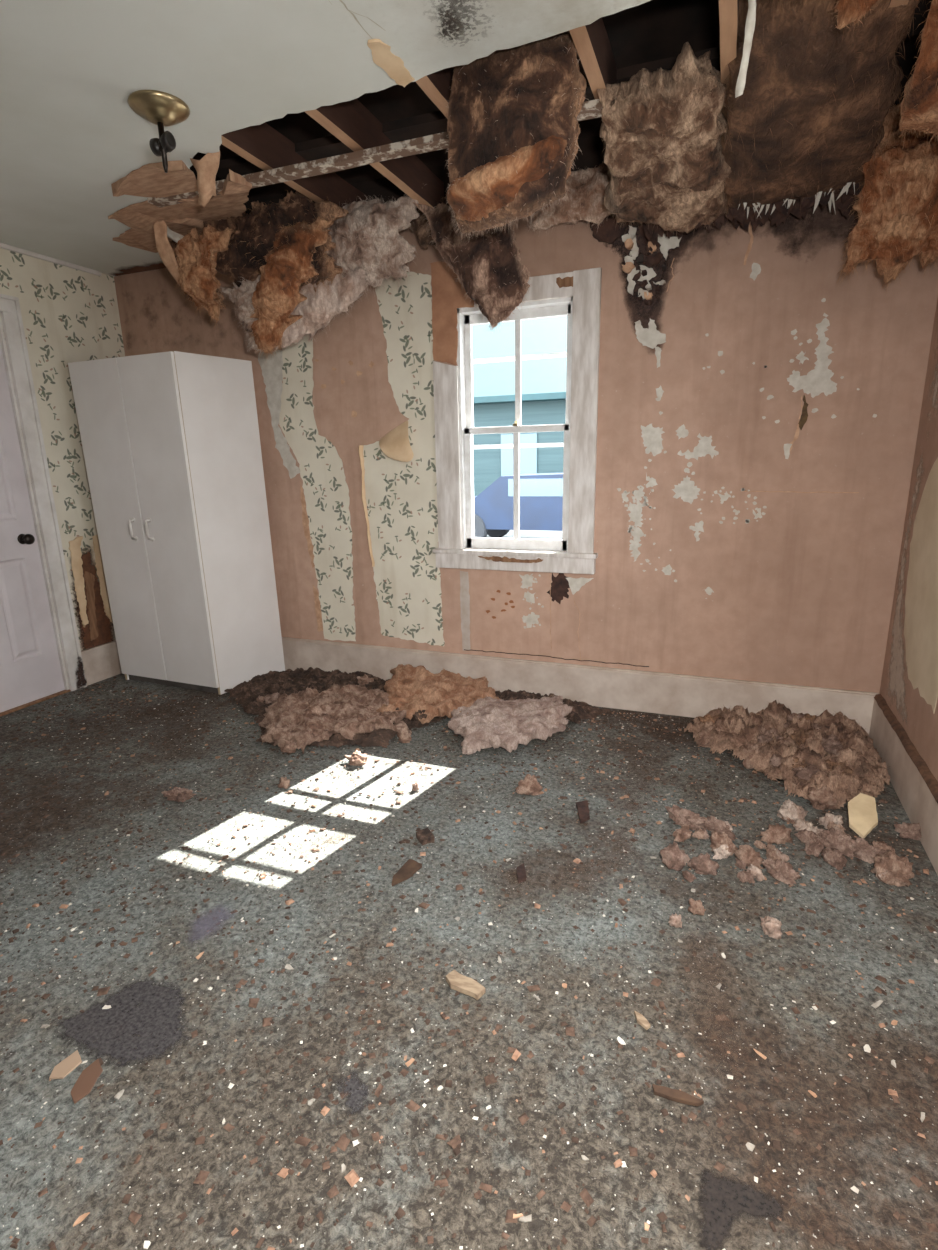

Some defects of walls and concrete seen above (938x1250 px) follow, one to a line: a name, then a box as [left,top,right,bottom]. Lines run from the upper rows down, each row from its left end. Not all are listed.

mould [439,0,475,40]
flaking render [430,261,474,366]
peeling [556,276,573,288]
peeling [590,215,682,301]
peeling [635,319,666,368]
peeling [787,298,844,418]
peeling [258,350,315,568]
peeling [617,386,767,582]
flaking render [478,556,593,629]